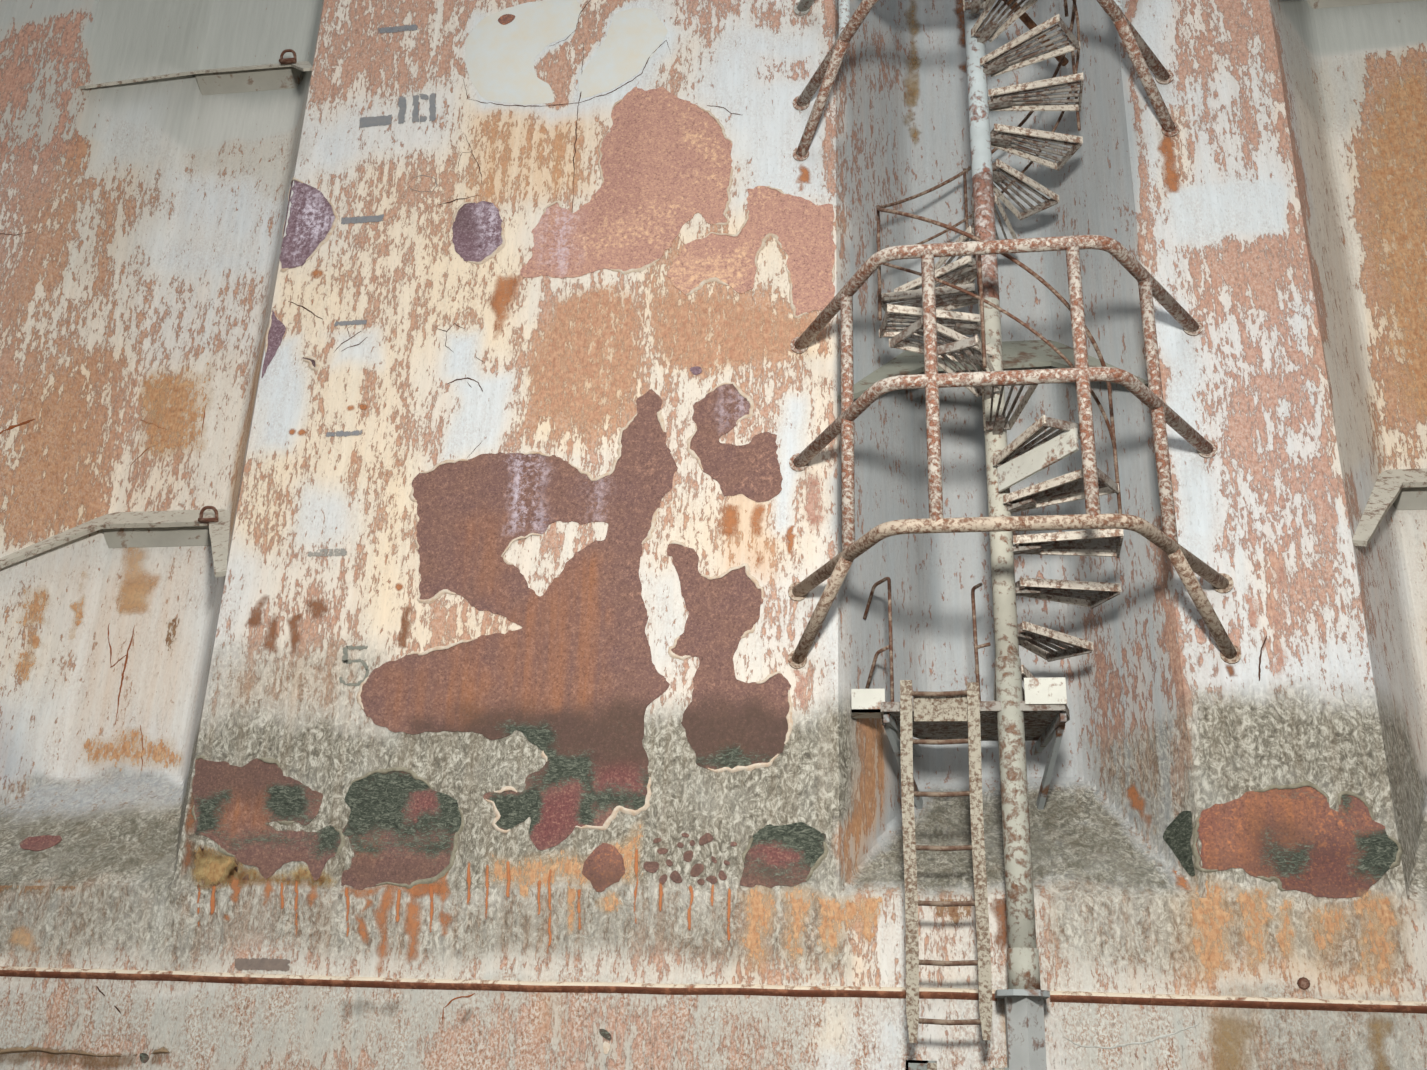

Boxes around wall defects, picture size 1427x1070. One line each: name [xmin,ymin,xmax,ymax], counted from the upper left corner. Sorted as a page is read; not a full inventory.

peeling [279,177,339,272]
peeling [452,201,506,265]
peeling [520,86,837,318]
rust [1362,71,1427,418]
peeling [356,382,793,892]
rust [184,793,451,969]
peeling [191,755,464,890]
rust [467,824,643,952]
peeling [643,822,828,888]
rust [711,885,883,972]
peeling [1163,780,1403,898]